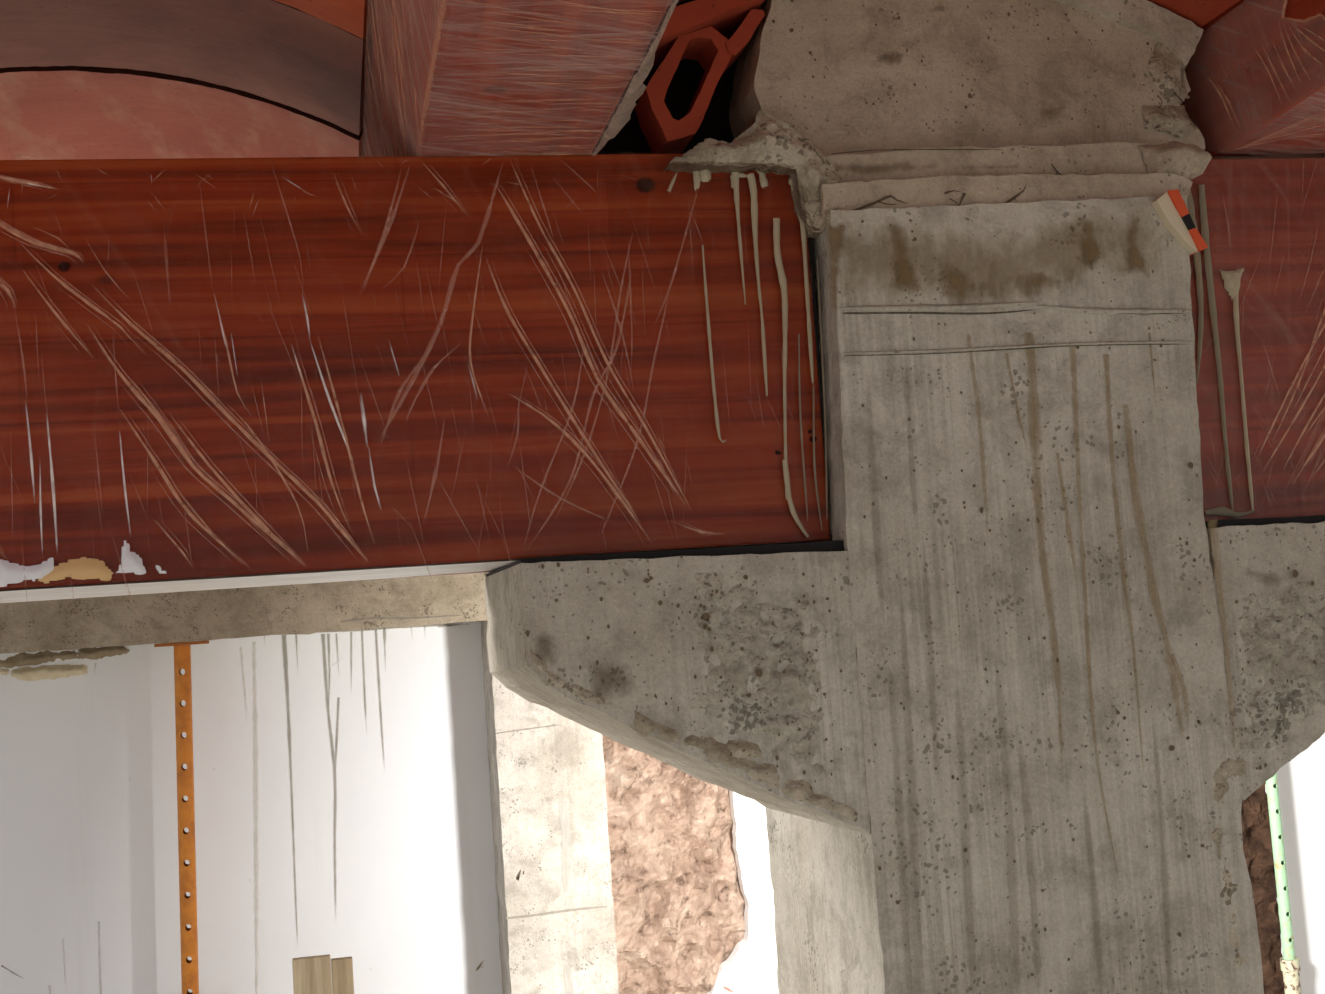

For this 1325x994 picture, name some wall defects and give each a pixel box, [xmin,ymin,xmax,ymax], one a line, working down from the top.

leakage [828,228,842,297]
leakage [863,223,1144,301]
peeling [38,557,113,584]
flaking render [0,646,130,681]
spalling [524,642,613,709]
spalling [630,572,858,826]
leakage [1086,615,1096,743]